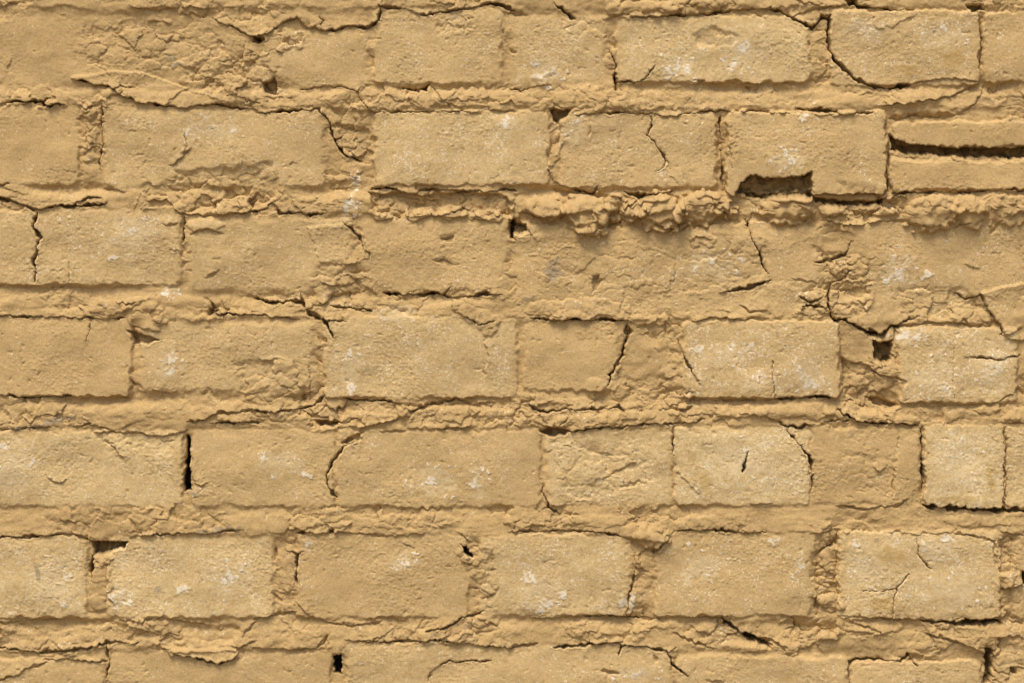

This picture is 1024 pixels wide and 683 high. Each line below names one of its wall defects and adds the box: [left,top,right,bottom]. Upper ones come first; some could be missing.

crack [823,12,912,92]
crack [644,113,672,173]
crack [27,211,45,285]
crack [248,394,363,500]
crack [526,323,630,427]
peeling [675,289,1024,510]